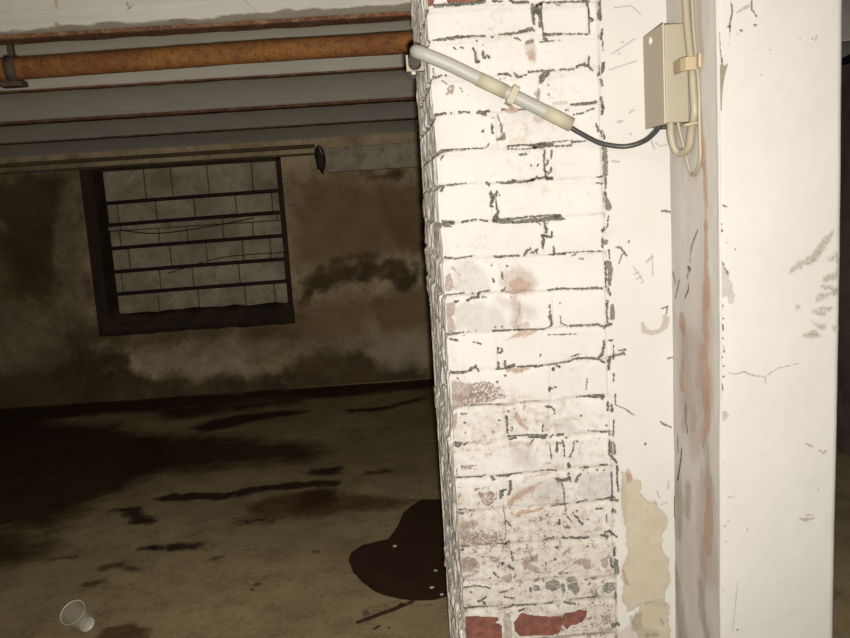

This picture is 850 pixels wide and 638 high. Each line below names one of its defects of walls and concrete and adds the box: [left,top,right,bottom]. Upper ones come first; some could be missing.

leakage [297,170,417,337]
corrosion [701,139,710,445]
leakage [0,347,435,563]
leakage [349,499,447,600]
peeling [465,616,502,638]
peeling [514,472,671,638]